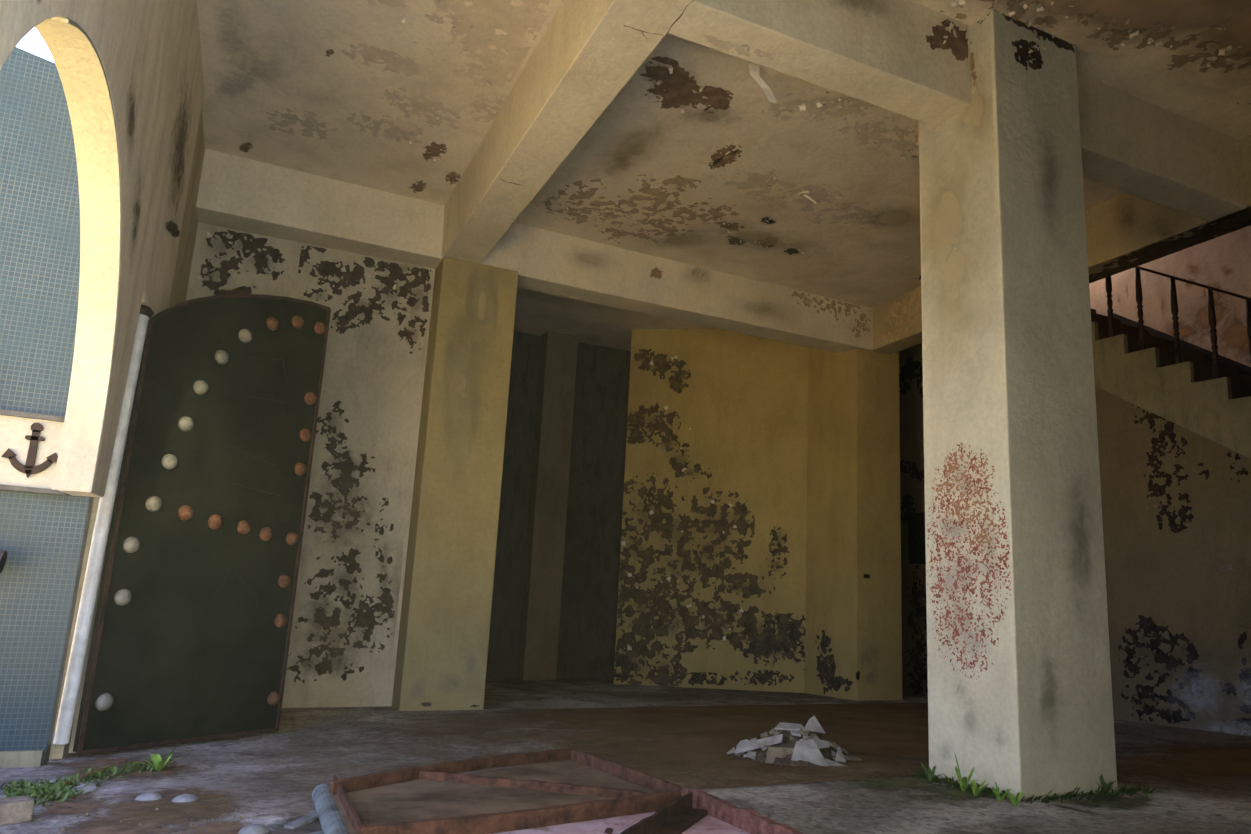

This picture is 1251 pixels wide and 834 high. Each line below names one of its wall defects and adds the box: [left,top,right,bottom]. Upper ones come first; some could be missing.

peeling [263,0,550,162]
spalling [640,56,734,113]
peeling [926,0,1251,86]
spalling [409,181,427,193]
spalling [445,172,461,185]
peeling [542,144,889,258]
peeling [634,349,691,394]
peeling [1133,406,1210,533]
peeling [287,400,395,684]
peeling [614,403,860,695]
corrosion [926,443,1011,680]
peeling [1118,615,1251,727]